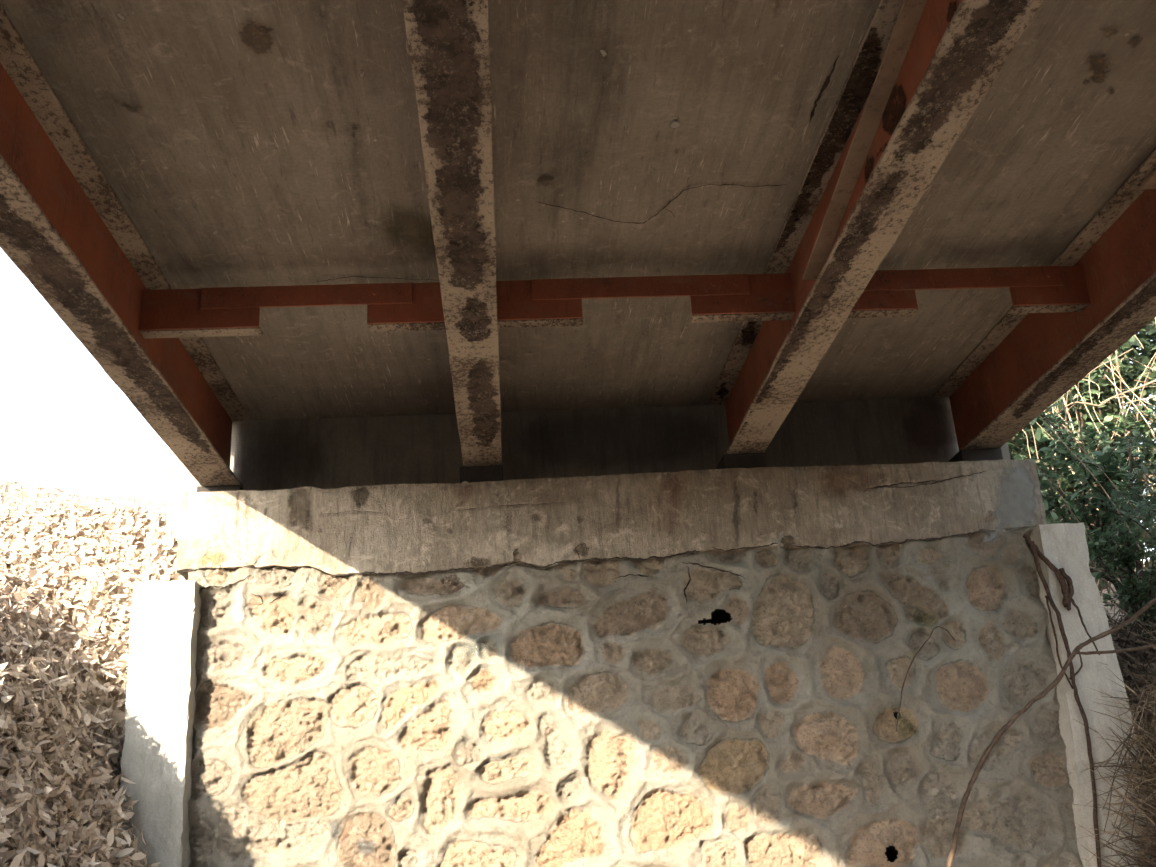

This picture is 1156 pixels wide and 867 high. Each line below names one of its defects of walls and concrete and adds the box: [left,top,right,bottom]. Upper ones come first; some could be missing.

crack [809,55,839,123]
crack [535,184,781,224]
corrosion [738,0,1031,435]
crack [863,471,985,493]
crack [177,565,302,605]
crack [326,529,988,605]